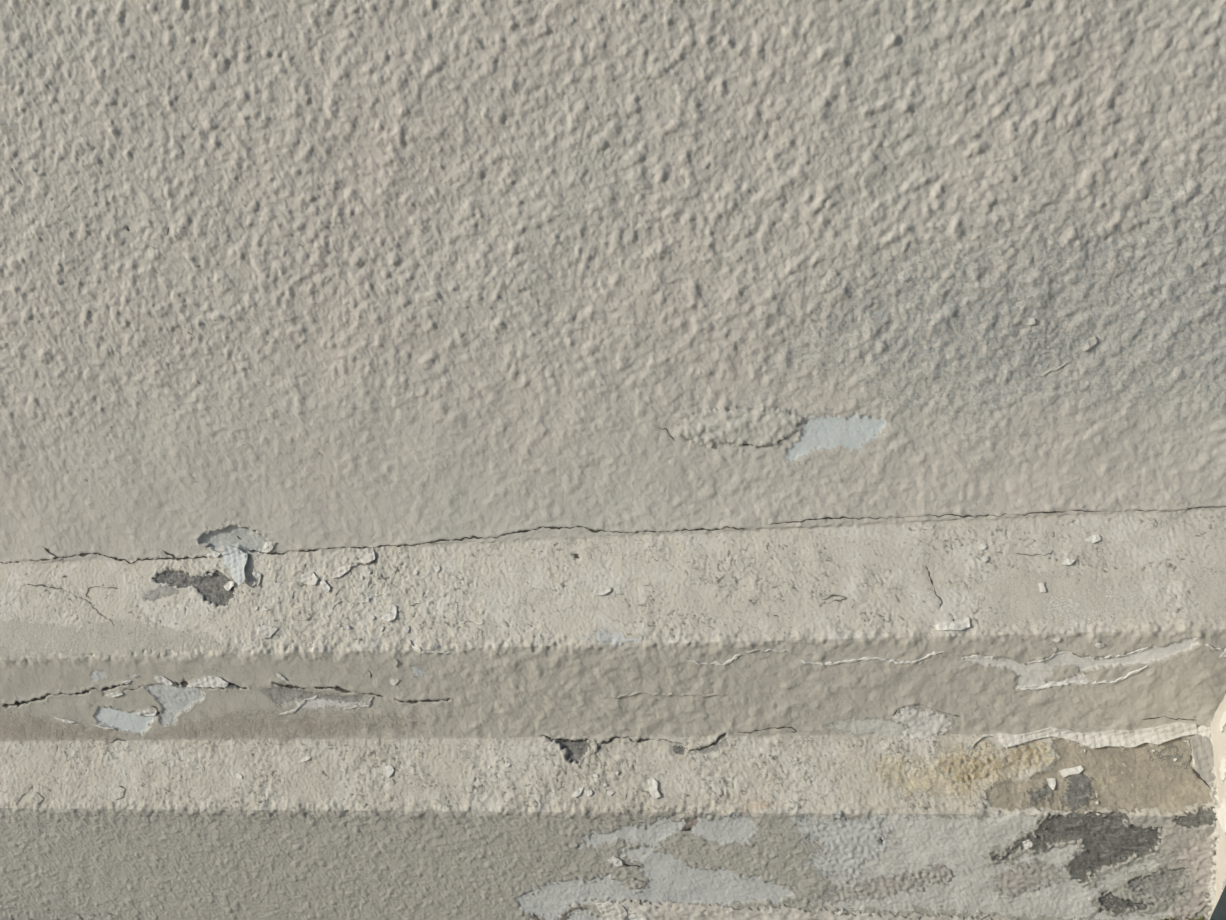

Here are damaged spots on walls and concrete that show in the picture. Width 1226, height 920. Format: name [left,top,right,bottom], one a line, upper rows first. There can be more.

crack [0,548,207,626]
spalling [144,525,277,607]
peeling [291,550,456,685]
crack [248,506,1226,595]
crack [823,594,847,603]
crack [926,567,979,621]
peeling [91,670,229,734]
spalling [549,737,597,764]
crack [543,727,797,751]
peeling [960,637,1226,690]
peeling [790,705,1226,920]
peeling [515,813,794,920]